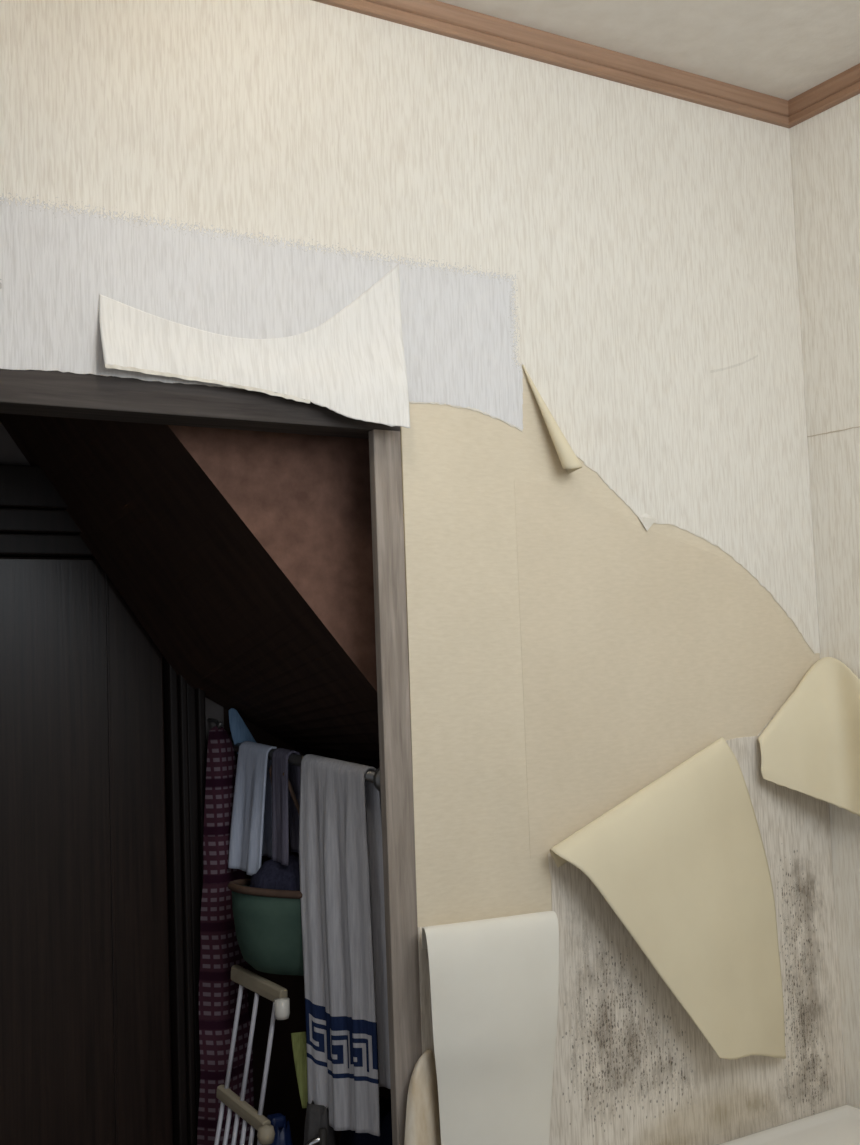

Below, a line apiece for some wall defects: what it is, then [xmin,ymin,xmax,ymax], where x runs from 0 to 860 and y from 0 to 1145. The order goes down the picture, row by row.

peeling [402,365,820,927]